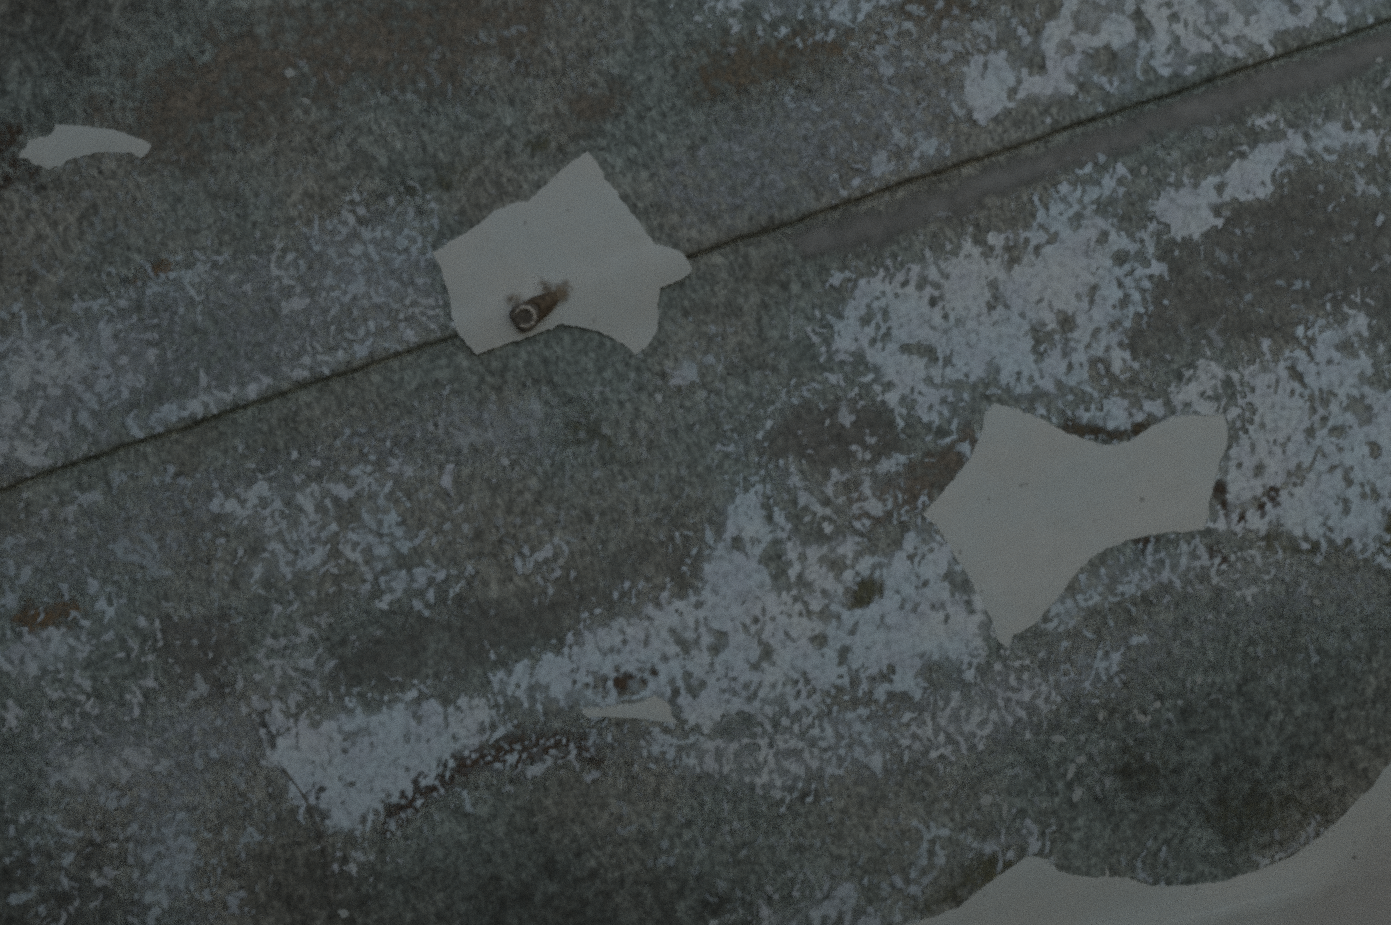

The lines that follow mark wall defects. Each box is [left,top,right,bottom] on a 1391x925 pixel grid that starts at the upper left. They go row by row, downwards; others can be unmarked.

peeling [18,124,151,170]
peeling [693,0,1382,204]
peeling [0,151,692,477]
peeling [215,103,1391,877]
peeling [0,385,541,925]
peeling [709,762,1391,925]